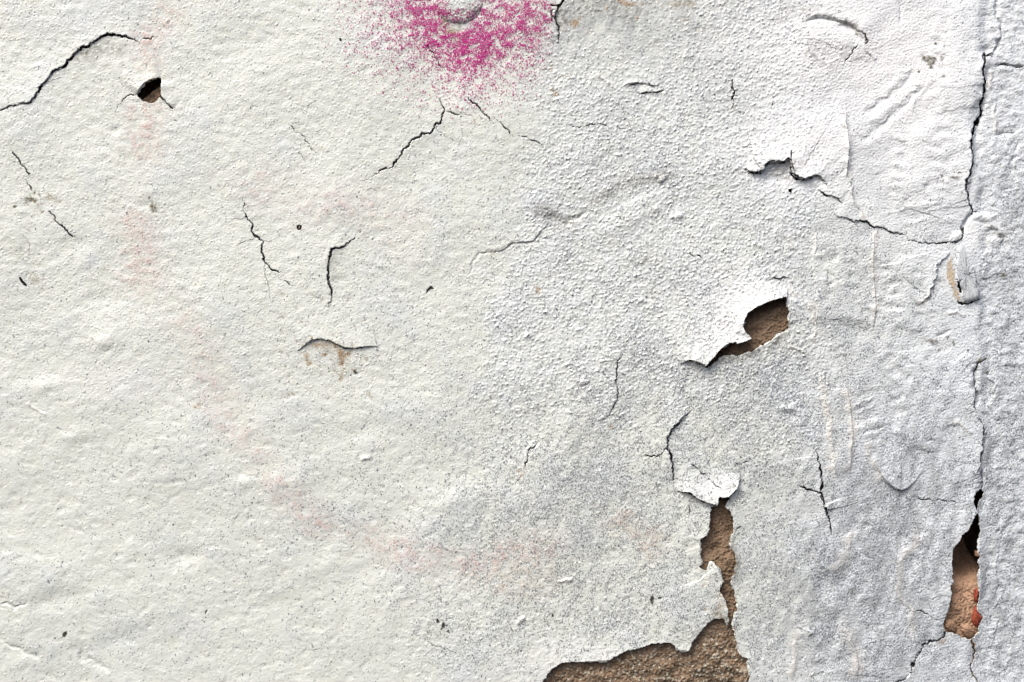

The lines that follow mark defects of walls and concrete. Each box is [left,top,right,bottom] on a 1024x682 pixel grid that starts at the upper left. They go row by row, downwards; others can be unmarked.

crack [2,33,159,110]
spalling [137,78,162,103]
crack [365,97,548,190]
crack [739,53,1023,244]
crack [233,200,290,294]
crack [327,228,361,306]
spalling [679,275,792,371]
crack [641,377,722,541]
crack [800,452,832,534]
spalling [543,473,750,682]
spalling [943,535,982,640]